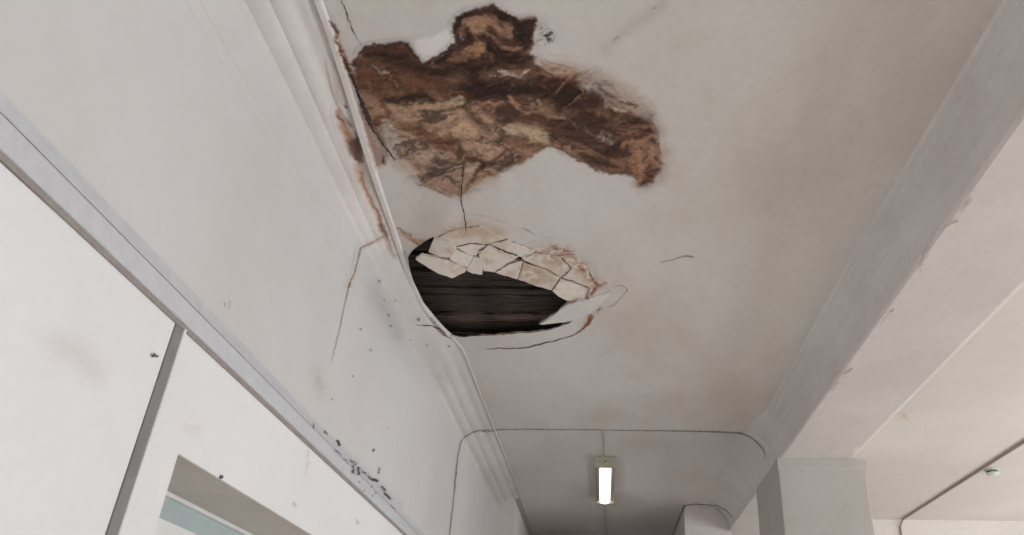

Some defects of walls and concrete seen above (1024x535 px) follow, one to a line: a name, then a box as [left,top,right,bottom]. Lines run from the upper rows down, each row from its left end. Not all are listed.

crack [348,67,395,161]
water stain [347,0,676,204]
crack [332,234,389,359]
flaking render [409,231,611,325]
crack [439,165,628,349]